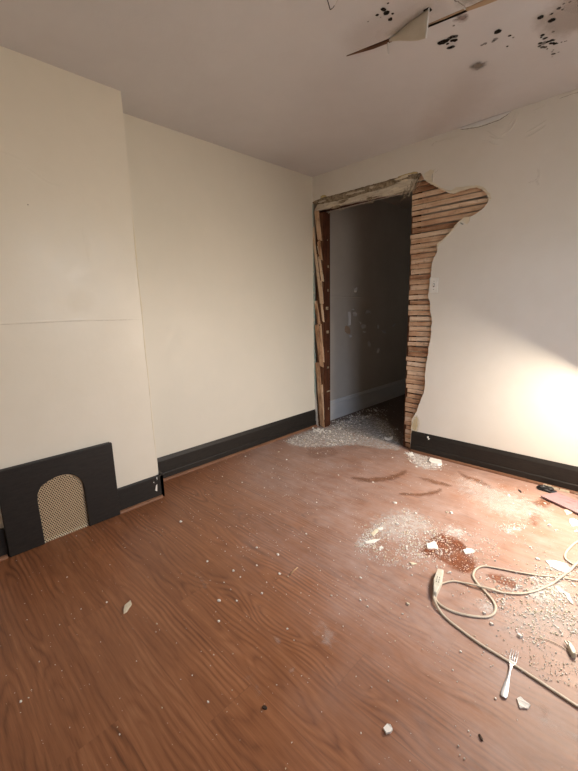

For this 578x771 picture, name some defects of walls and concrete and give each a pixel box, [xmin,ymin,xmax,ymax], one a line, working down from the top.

water stain [437,35,458,49]
spalling [388,169,491,448]